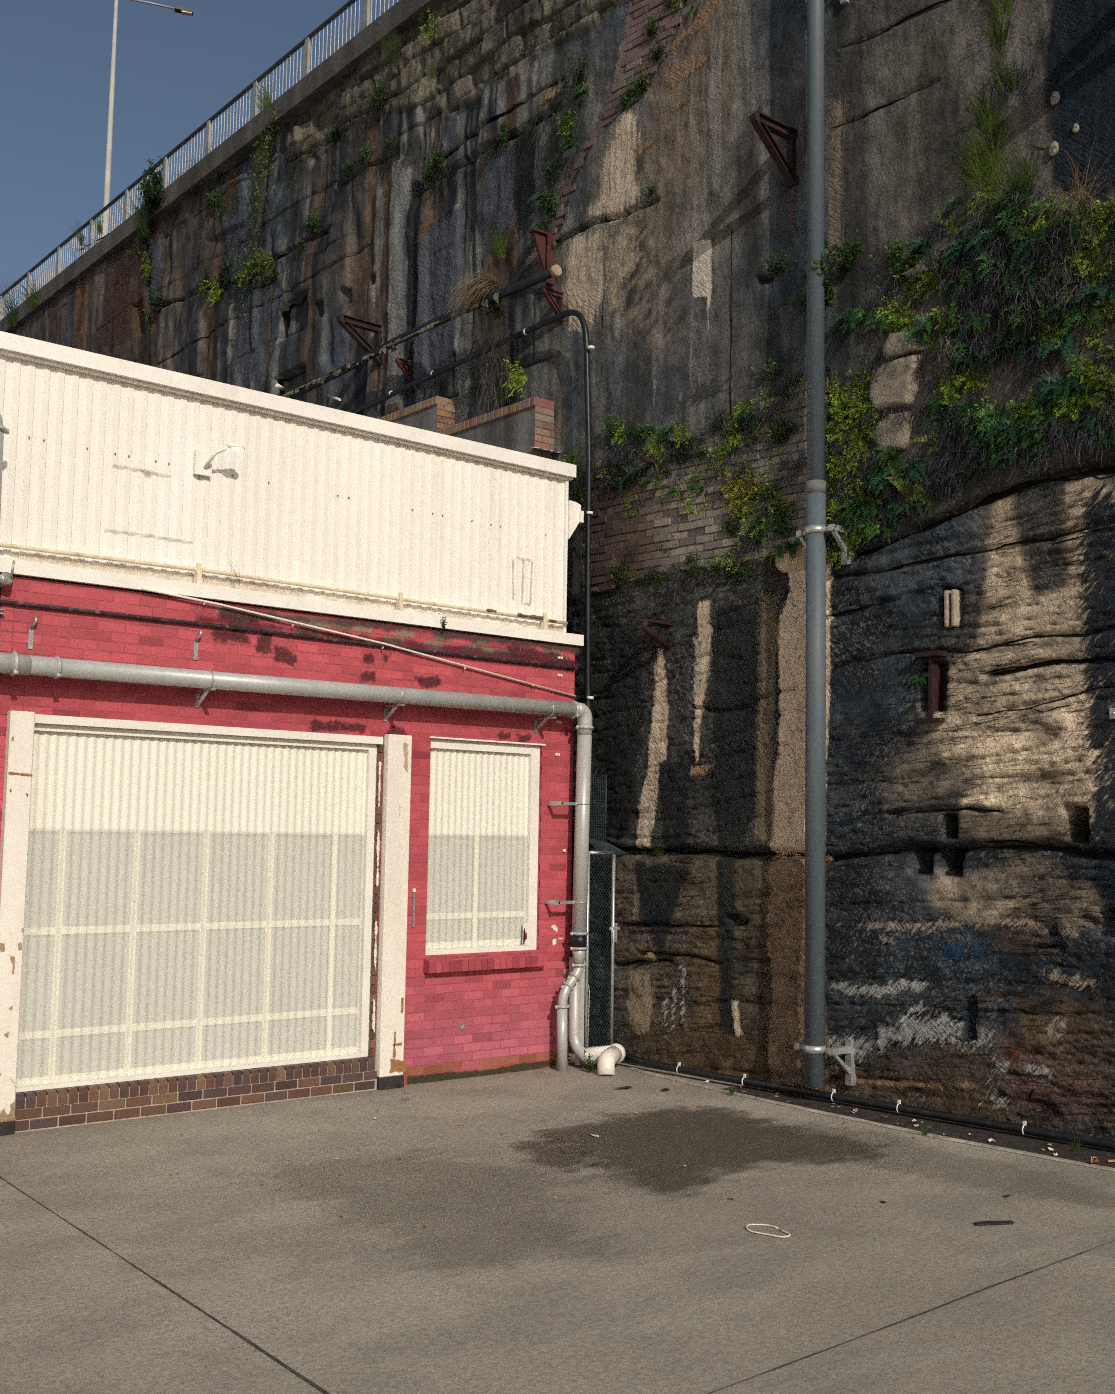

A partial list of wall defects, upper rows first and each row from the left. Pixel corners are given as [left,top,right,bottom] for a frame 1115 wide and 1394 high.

damp [1039,0,1115,200]
damp [222,214,270,392]
peeling [0,928,24,974]
damp [520,1108,877,1191]